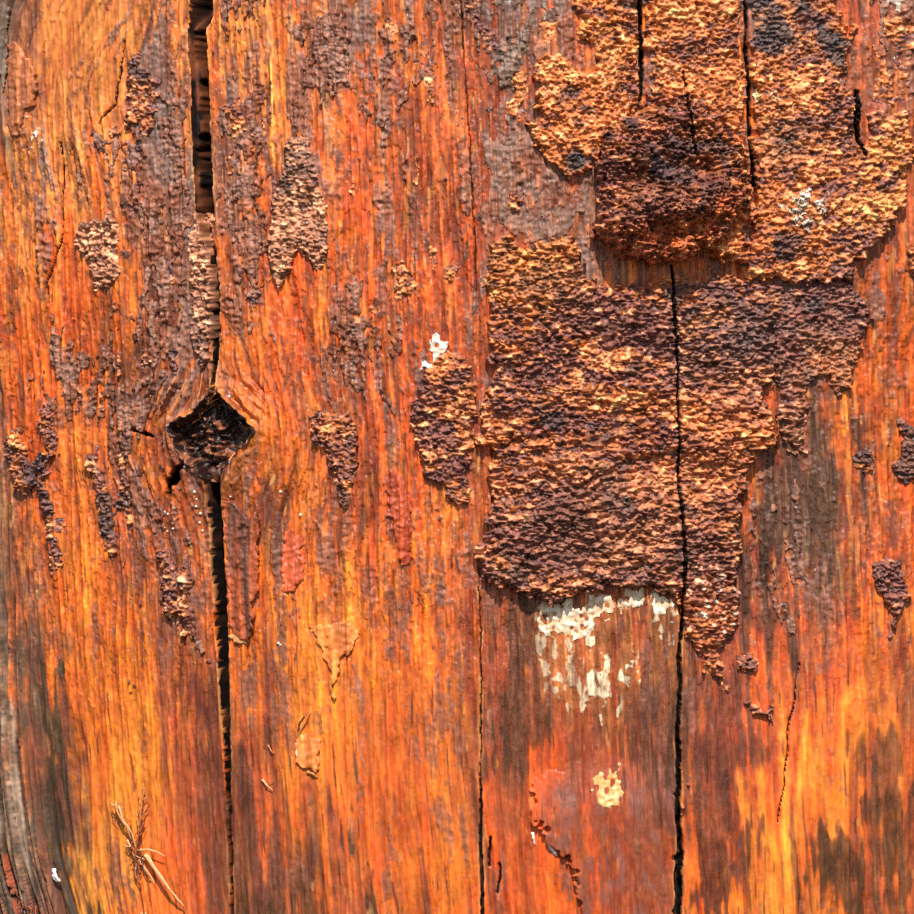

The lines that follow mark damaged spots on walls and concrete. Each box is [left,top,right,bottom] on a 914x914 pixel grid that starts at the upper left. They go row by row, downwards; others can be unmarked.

crack [187,0,214,214]
crack [460,0,477,291]
crack [636,0,644,101]
crack [682,71,698,156]
crack [743,0,761,192]
crack [210,252,221,385]
crack [168,465,185,497]
crack [204,479,234,914]
crack [478,587,502,914]
water stain [478,585,679,784]
crack [670,266,688,914]